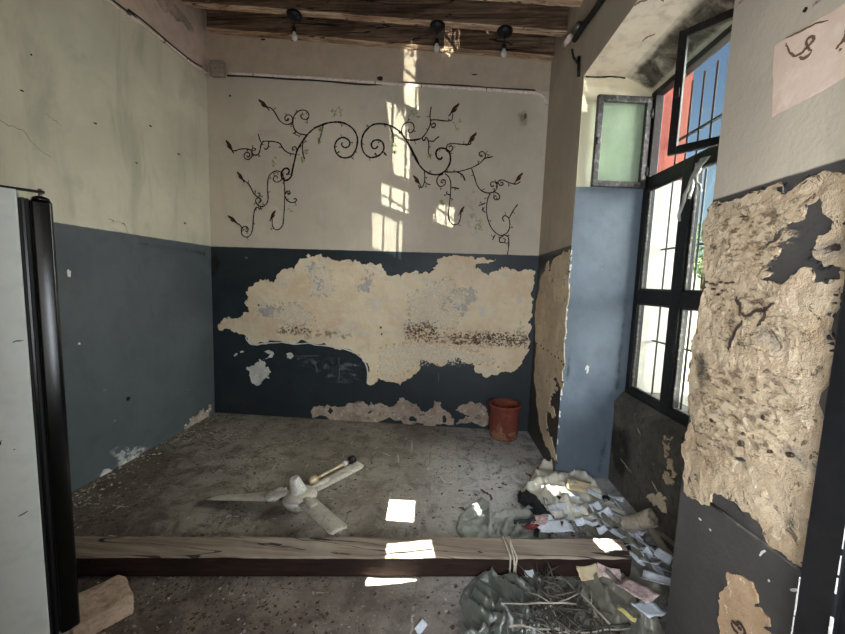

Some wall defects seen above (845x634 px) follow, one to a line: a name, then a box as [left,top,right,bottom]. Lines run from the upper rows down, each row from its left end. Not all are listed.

spalling [184,404,212,430]
peeling [217,250,572,464]
peeling [645,170,845,567]
spalling [717,572,772,634]